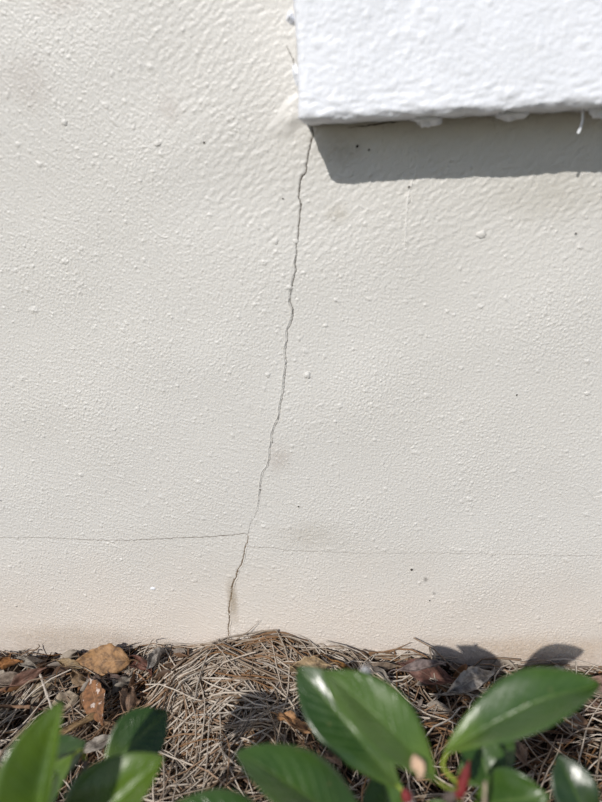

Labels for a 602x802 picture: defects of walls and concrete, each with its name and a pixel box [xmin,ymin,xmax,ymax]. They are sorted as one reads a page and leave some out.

crack [115,126,314,636]